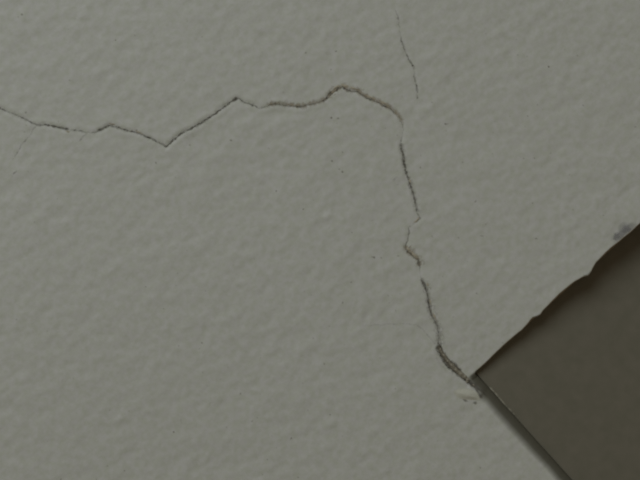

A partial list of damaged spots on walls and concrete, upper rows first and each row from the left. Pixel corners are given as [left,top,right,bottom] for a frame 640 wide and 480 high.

crack [166,97,253,147]
crack [269,84,400,117]
crack [405,246,420,265]
crack [423,282,437,325]